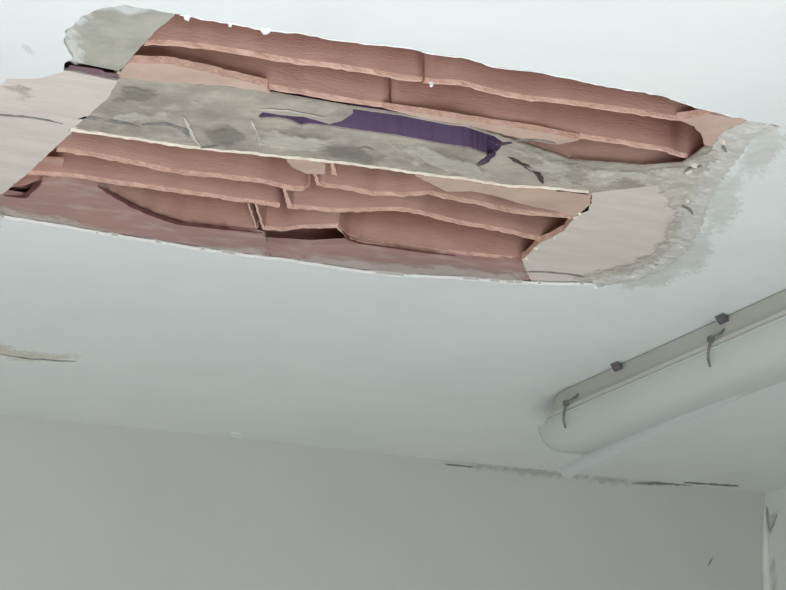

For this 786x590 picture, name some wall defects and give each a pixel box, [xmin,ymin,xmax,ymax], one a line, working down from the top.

spalling [4,14,786,289]